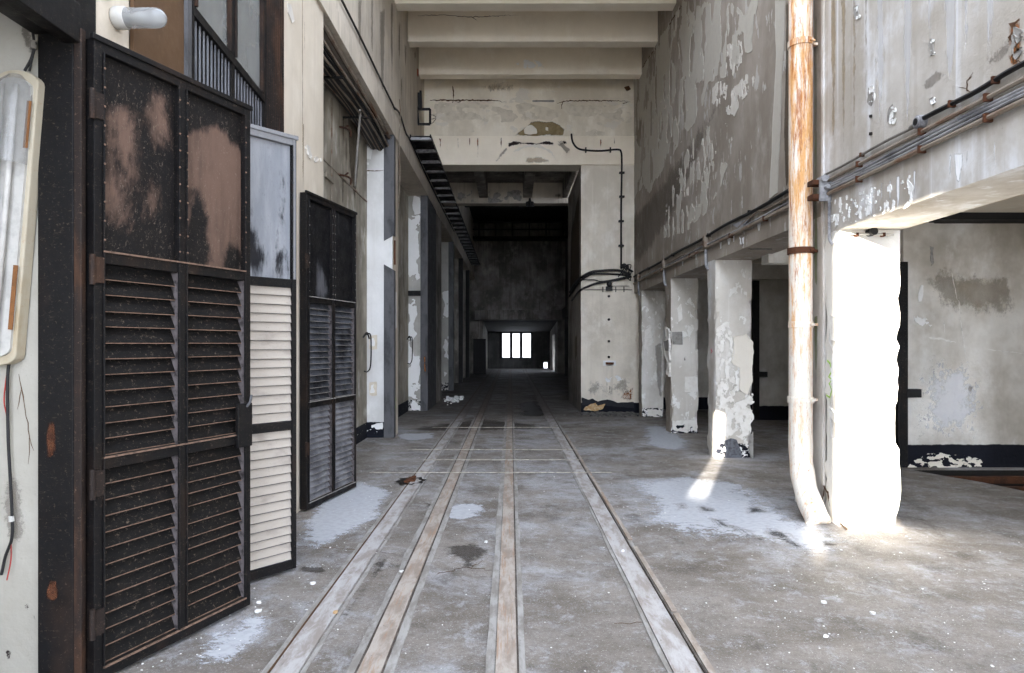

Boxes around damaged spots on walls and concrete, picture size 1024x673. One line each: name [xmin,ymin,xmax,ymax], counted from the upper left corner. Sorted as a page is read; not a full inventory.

peeling [624,0,758,238]
peeling [769,0,786,198]
rust [46,424,56,455]
peeling [396,298,420,410]
flaking render [716,321,755,458]
spalling [908,453,1024,486]
rust [47,582,58,600]